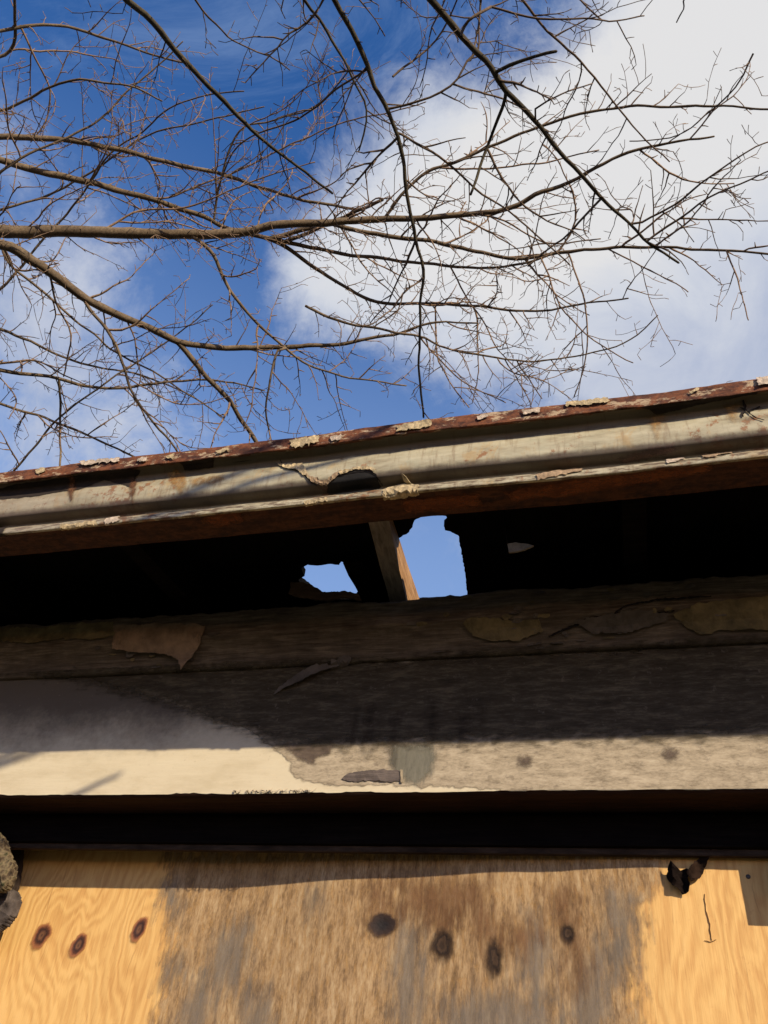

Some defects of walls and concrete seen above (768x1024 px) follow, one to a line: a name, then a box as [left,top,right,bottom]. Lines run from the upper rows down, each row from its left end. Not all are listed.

spalling [276,462,419,507]
peeling [536,468,583,480]
rust [508,464,712,501]
peeling [60,516,120,531]
peeling [601,581,768,635]
peeling [0,620,219,670]
peeling [342,769,403,783]
damp [149,852,668,1024]